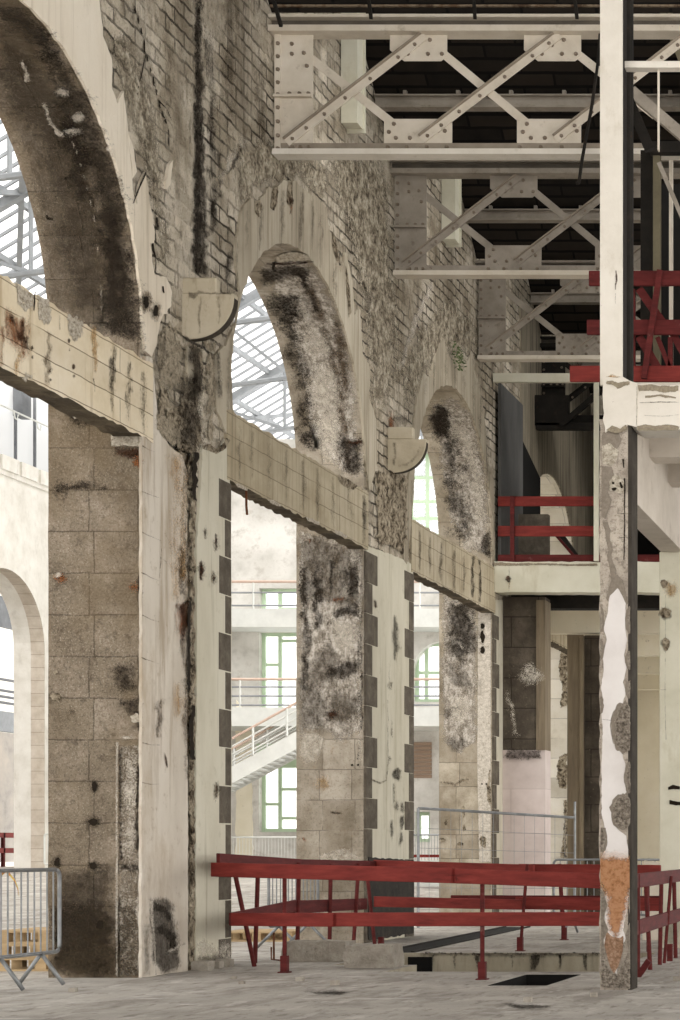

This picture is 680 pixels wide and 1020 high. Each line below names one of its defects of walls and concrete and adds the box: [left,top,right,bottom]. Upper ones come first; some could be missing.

corrosion [2,312,30,369]
efflorescence [313,369,340,459]
damp [298,539,361,690]
damp [444,540,482,663]
crack [187,445,199,971]
spalling [600,651,631,852]
damp [54,746,139,976]
corrosion [600,857,630,973]
spalling [601,888,630,989]